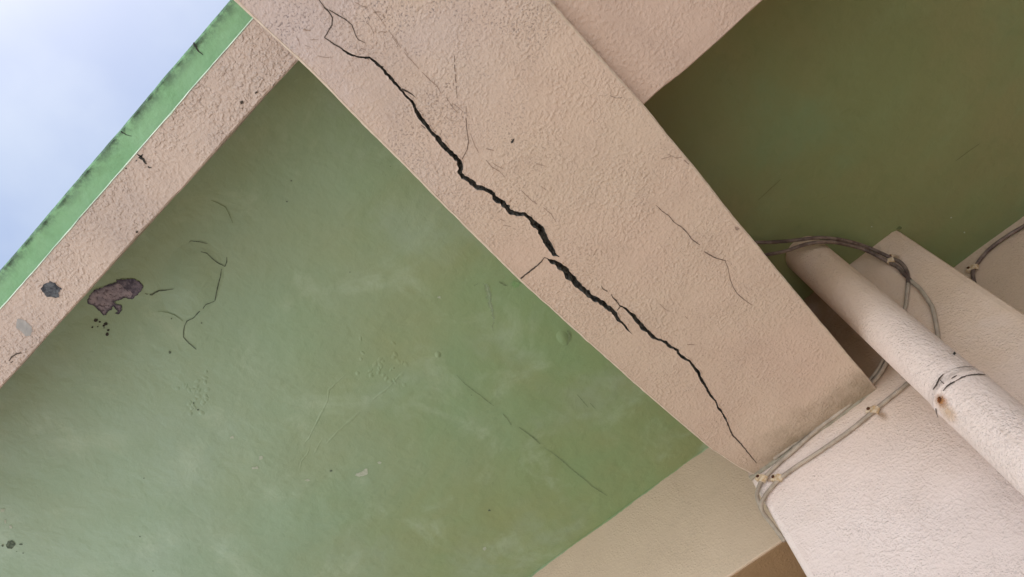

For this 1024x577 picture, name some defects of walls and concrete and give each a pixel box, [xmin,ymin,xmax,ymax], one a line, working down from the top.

crack [297,0,756,462]
peeling [40,281,62,298]
spalling [87,278,144,336]
crack [145,241,227,349]
crack [462,381,606,495]